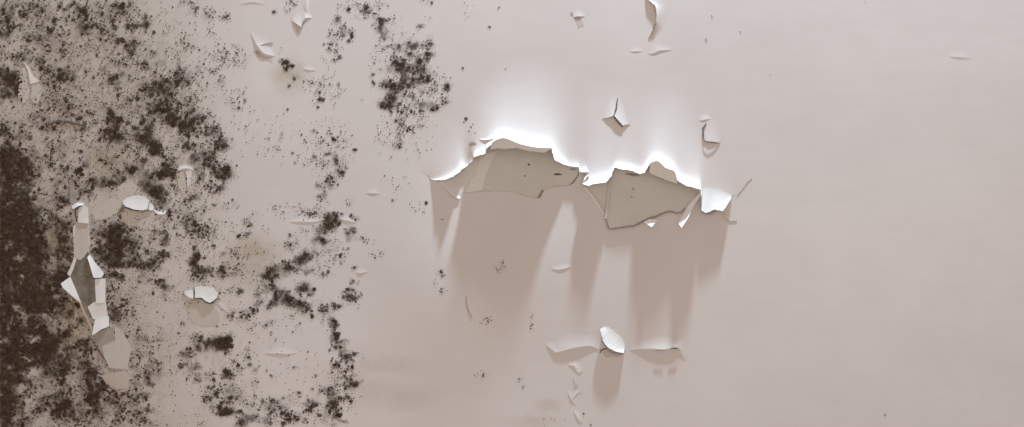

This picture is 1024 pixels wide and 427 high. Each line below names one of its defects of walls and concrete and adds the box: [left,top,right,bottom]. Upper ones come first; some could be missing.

peeling [648,0,669,42]
peeling [61,179,166,392]
peeling [184,287,229,327]
damp [0,0,453,427]
peeling [422,54,752,230]
peeling [600,327,625,357]